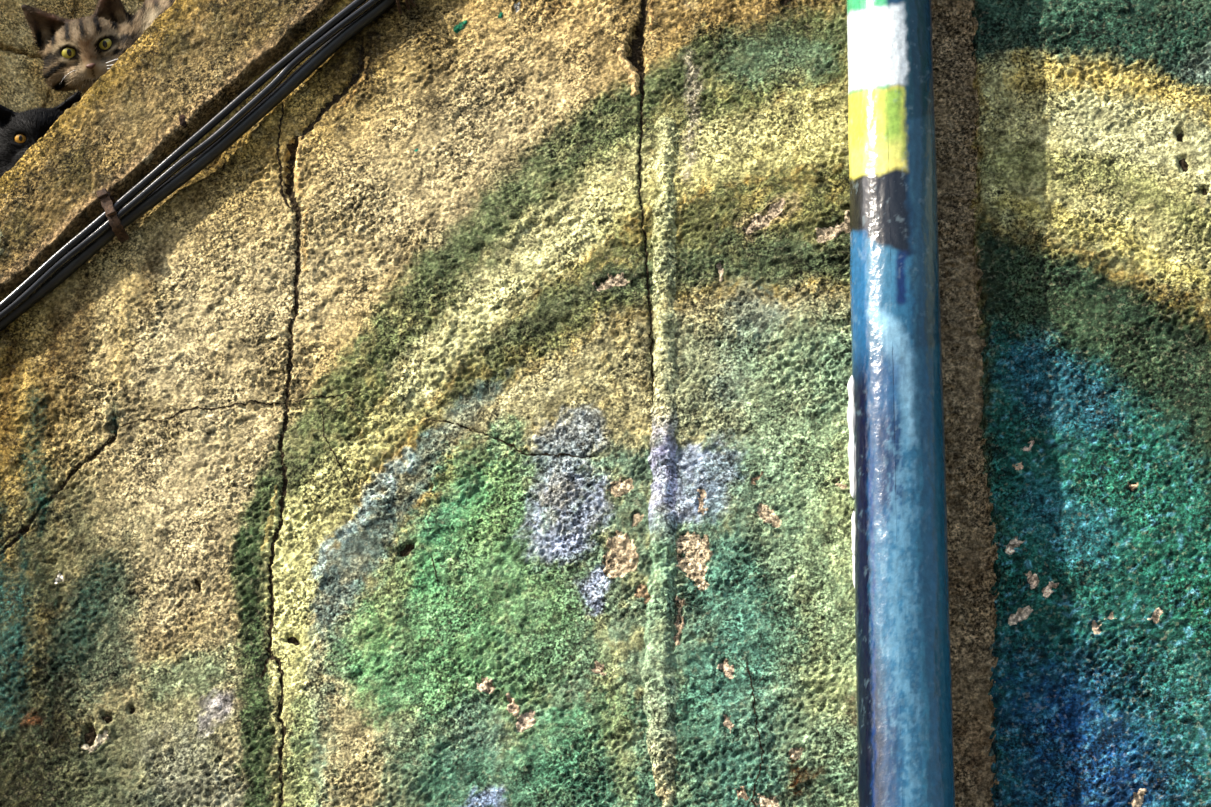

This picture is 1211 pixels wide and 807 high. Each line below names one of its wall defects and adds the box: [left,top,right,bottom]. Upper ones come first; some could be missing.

crack [616,0,655,395]
crack [0,41,370,807]
spalling [602,512,651,604]